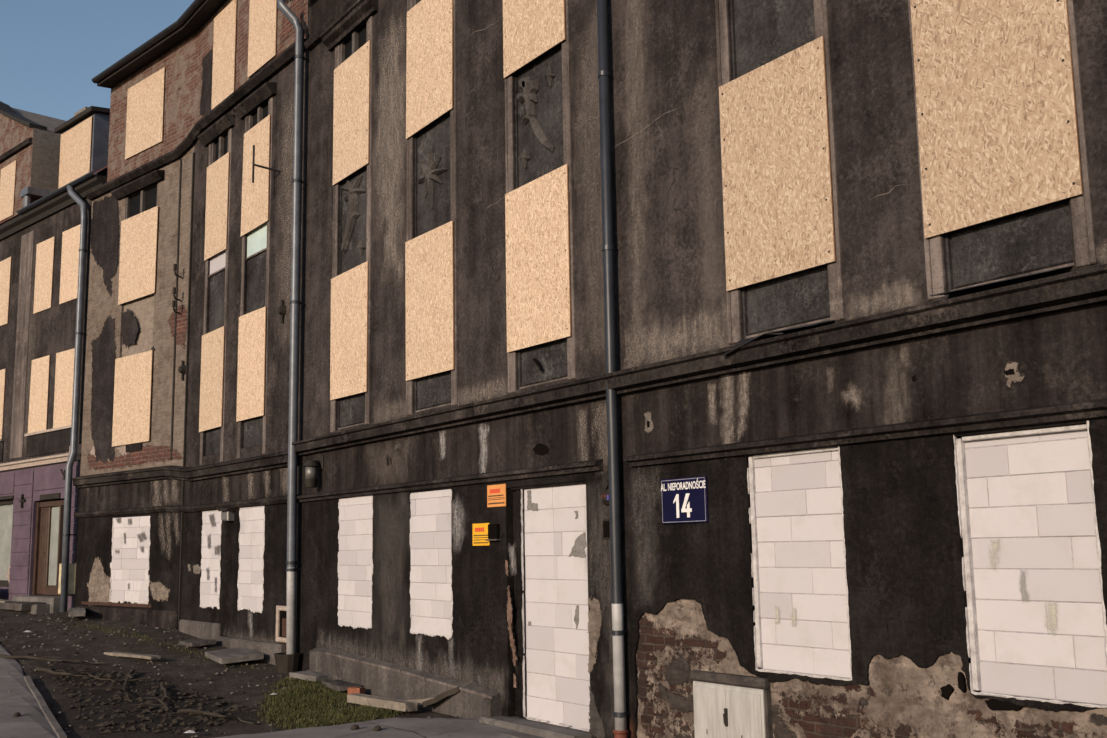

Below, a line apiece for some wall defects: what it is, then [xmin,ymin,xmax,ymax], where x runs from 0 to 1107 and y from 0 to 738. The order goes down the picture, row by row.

spalling [168,304,188,349]
peeling [87,308,182,470]
water stain [709,372,748,444]
spalling [1003,361,1024,388]
spalling [87,558,112,607]
spalling [149,581,170,602]
peeling [505,560,518,688]
peeling [587,596,605,738]
spalling [636,599,757,738]
spalling [770,652,1107,738]